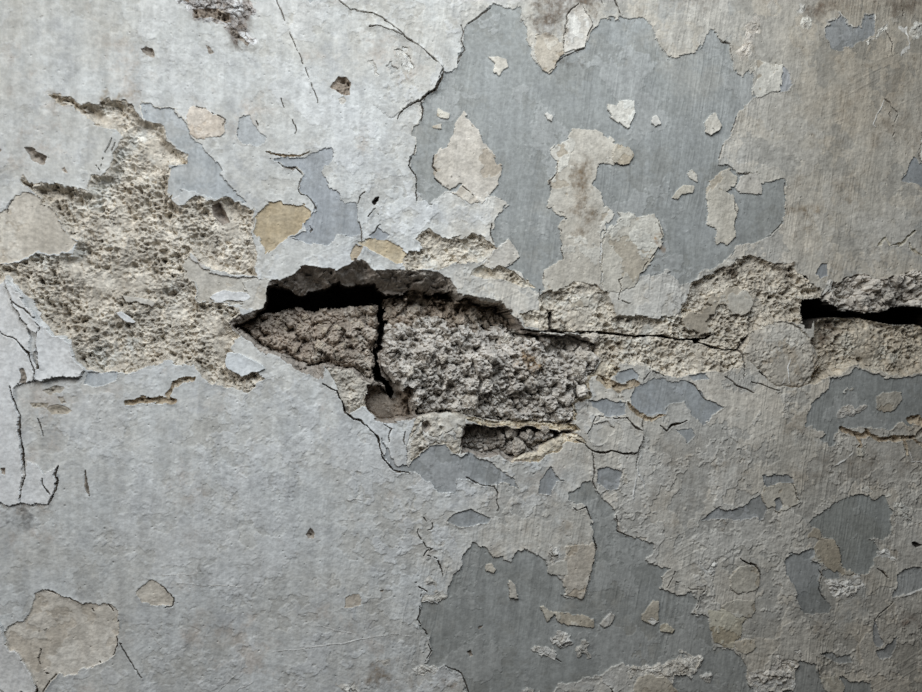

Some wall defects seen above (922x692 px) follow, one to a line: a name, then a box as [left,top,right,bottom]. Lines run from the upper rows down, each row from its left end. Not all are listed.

peeling [0,0,922,494]
crack [0,299,40,379]
crack [520,275,779,393]
crack [9,387,59,504]
peeling [412,466,872,692]
peeling [783,485,913,615]
peeling [4,589,120,692]
peeling [873,621,897,660]